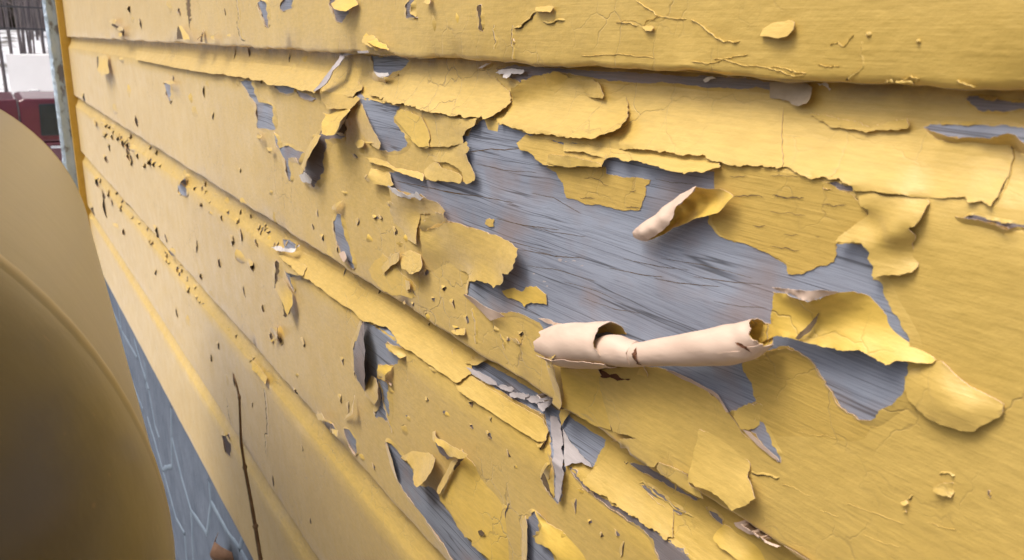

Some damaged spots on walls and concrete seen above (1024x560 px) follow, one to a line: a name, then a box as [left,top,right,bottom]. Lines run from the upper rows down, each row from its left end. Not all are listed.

crack [616,0,839,78]
crack [885,76,925,89]
crack [957,80,1011,101]
peeling [92,114,162,169]
peeling [176,169,229,221]
peeling [89,176,204,304]
peeling [228,198,254,269]
peeling [272,33,1024,560]
peeling [268,326,285,345]
crack [252,359,270,456]